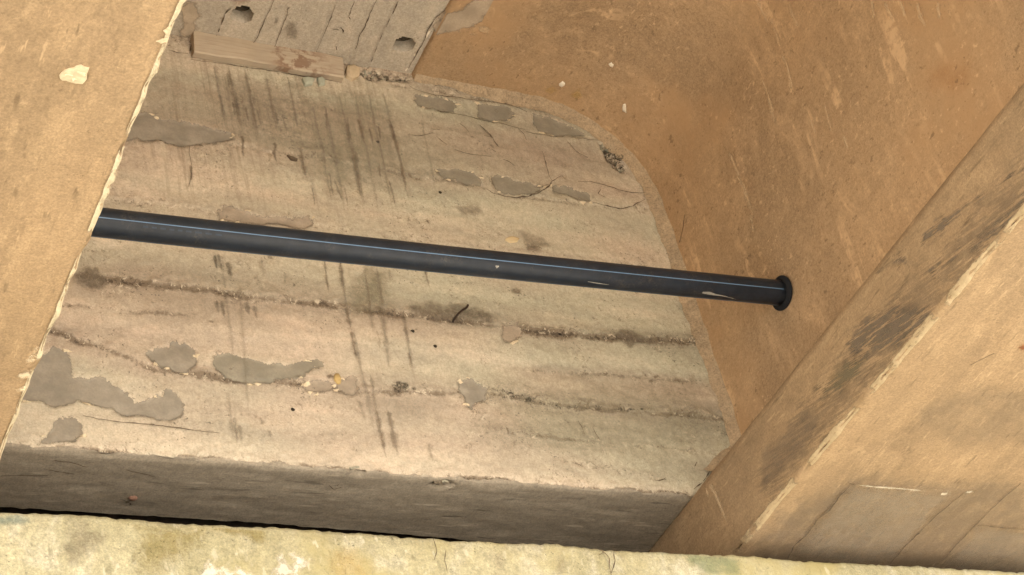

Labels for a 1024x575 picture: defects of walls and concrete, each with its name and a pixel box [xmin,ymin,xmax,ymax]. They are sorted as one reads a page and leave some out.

peeling [88,0,235,232]
peeling [413,94,461,112]
crack [408,10,645,209]
peeling [533,113,585,139]
spalling [599,145,623,173]
peeling [435,169,593,205]
peeling [0,252,185,459]
peeling [146,340,200,375]
peeling [213,353,360,396]
leakage [825,306,929,392]
peeling [457,377,488,410]